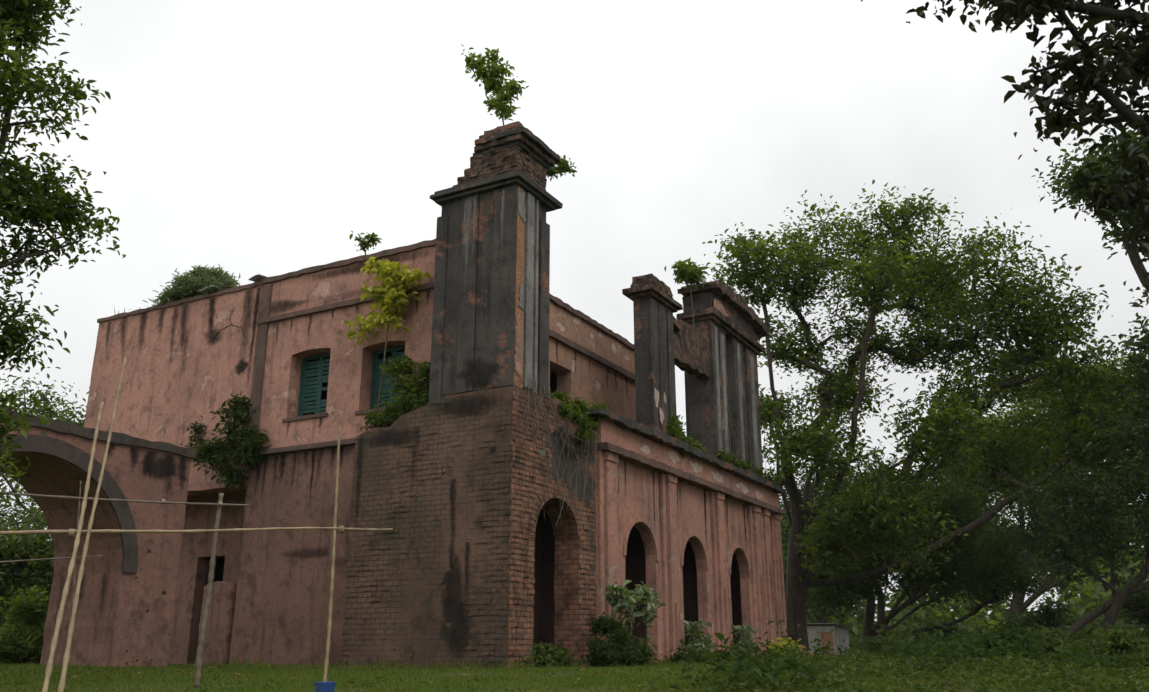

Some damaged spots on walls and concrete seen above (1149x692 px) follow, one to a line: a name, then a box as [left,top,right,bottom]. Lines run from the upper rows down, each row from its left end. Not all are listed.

water stain [140,304,188,344]
water stain [206,297,220,344]
water stain [242,287,260,370]
water stain [255,447,344,497]
peeling [530,421,596,575]
water stain [441,479,469,654]